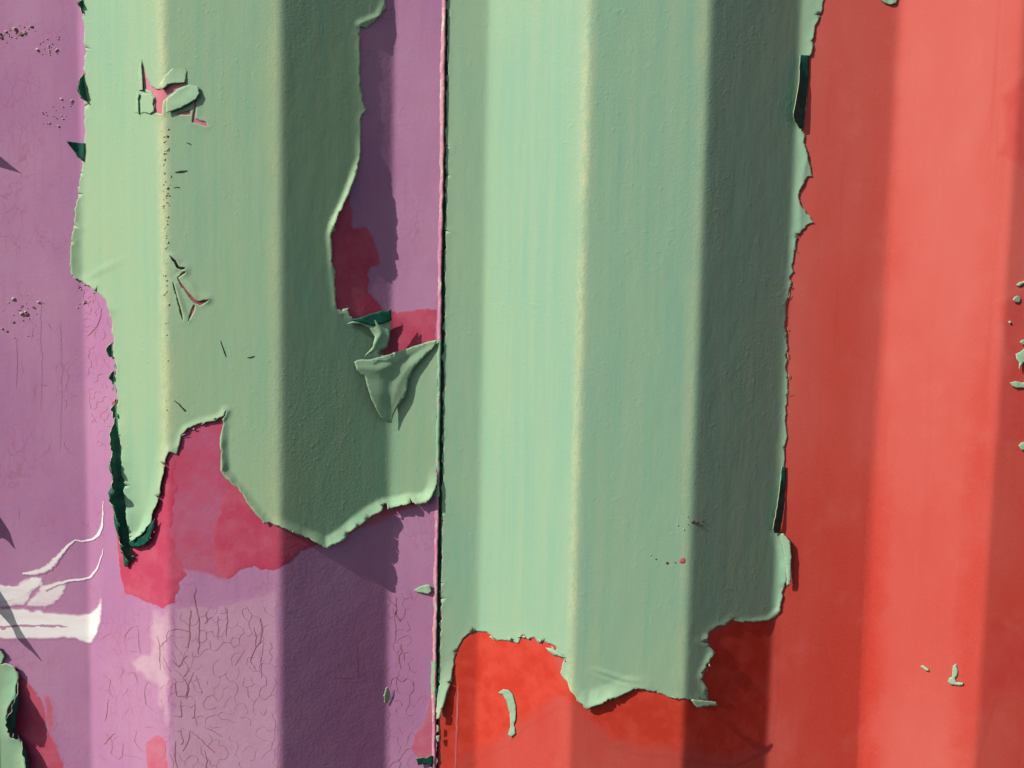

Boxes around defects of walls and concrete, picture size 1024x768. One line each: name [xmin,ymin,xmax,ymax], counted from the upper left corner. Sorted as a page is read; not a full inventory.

crack [170,256,208,319]
peeling [66,0,824,768]
peeling [1010,340,1024,388]
peeling [0,650,30,768]
crack [97,588,298,768]
peeling [948,664,963,685]